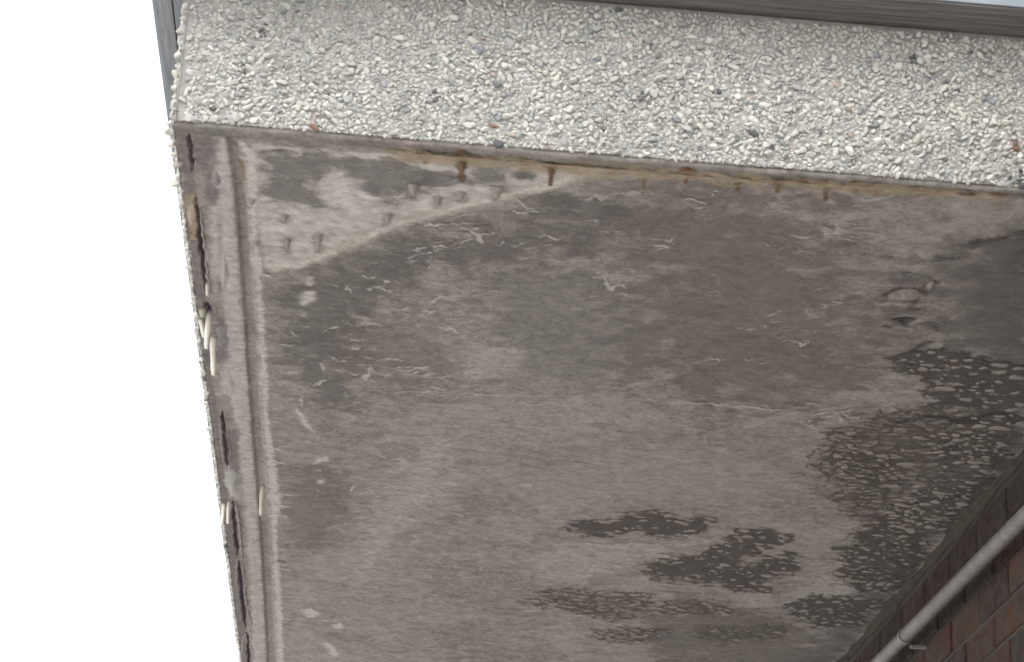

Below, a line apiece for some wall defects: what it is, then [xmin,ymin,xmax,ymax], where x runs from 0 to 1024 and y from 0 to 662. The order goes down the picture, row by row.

crack [187,133,195,170]
corrosion [391,147,1002,201]
crack [195,196,212,312]
water stain [179,135,895,662]